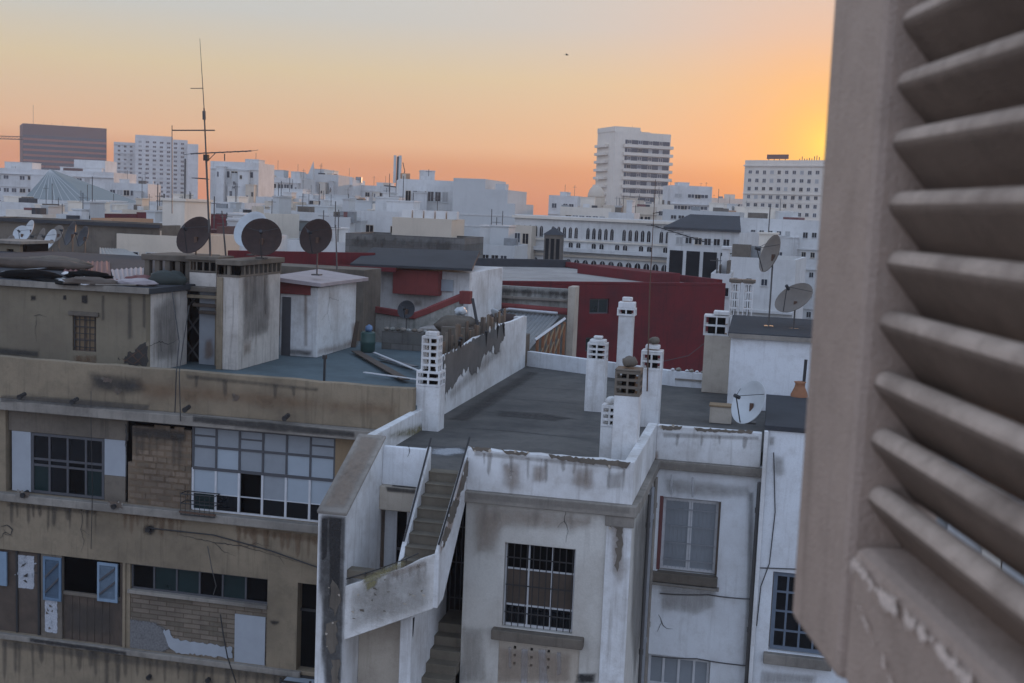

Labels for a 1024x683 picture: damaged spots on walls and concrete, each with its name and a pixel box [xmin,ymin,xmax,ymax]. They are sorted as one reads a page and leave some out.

spalling [118,341,150,367]
peeling [444,322,505,400]
water stain [94,376,141,391]
peeling [548,454,631,468]
spalling [609,526,623,572]